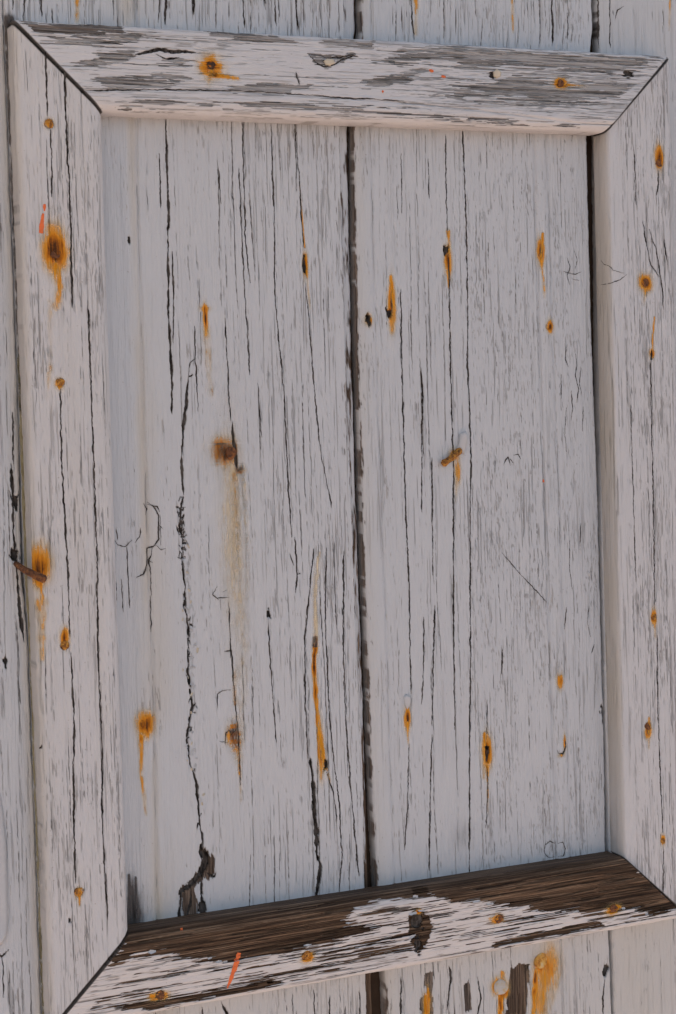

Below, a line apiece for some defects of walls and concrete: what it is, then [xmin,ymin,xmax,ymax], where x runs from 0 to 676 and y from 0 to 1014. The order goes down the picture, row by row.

peeling [20,21,195,111]
rust [199,54,239,80]
peeling [207,31,299,43]
peeling [196,82,580,127]
peeling [307,37,663,106]
rust [42,224,70,306]
rust [387,275,396,330]
crack [45,52,398,919]
rust [311,553,328,779]
rust [137,712,153,792]
peeling [91,849,676,1014]
rust [532,952,557,1014]